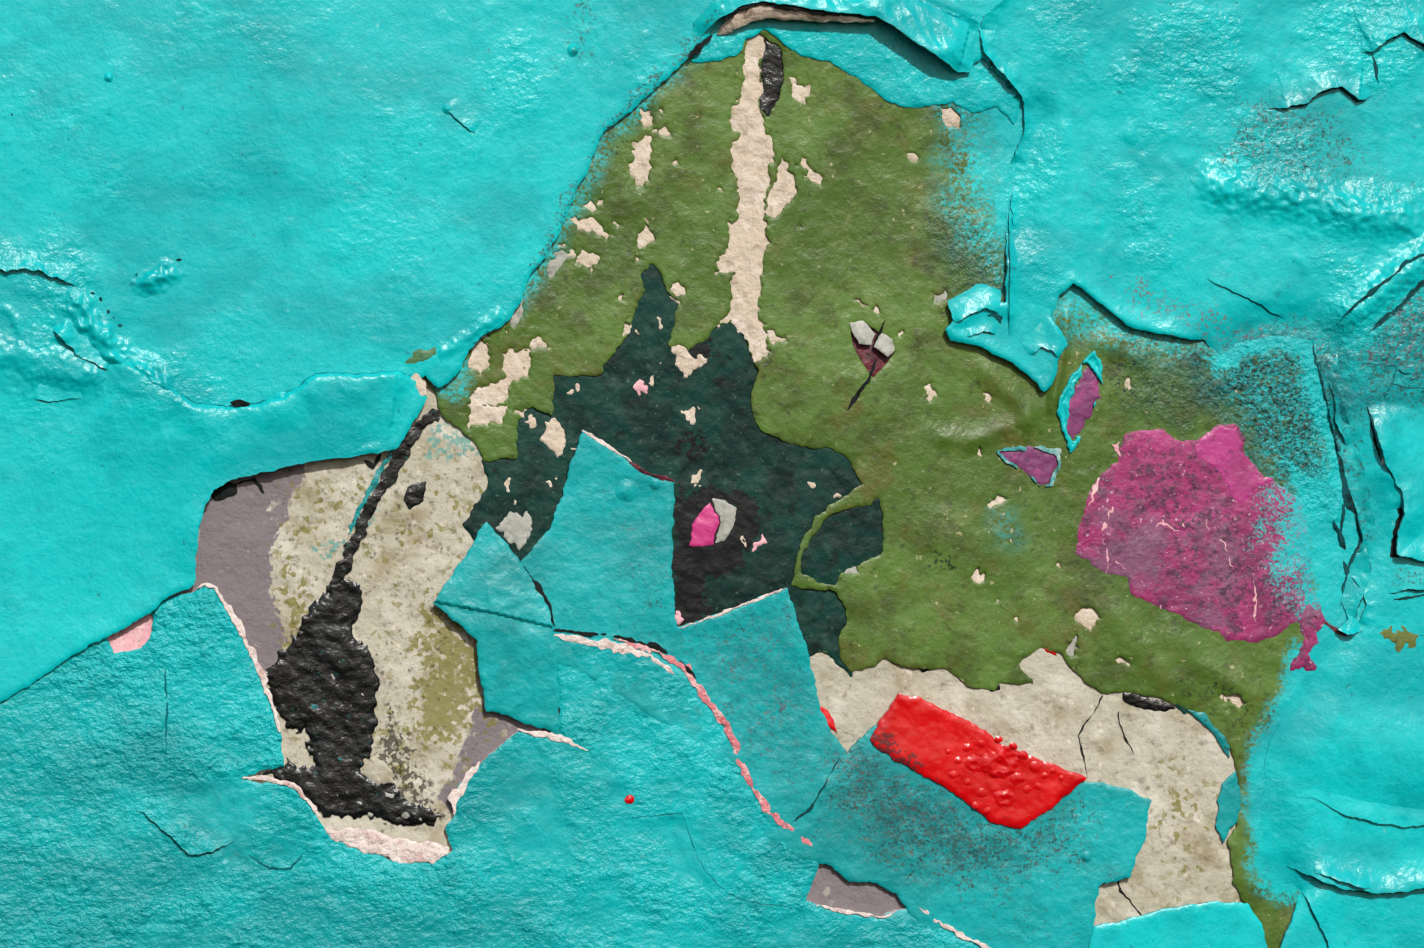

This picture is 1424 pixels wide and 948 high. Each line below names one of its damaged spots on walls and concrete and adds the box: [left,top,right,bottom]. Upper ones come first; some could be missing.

crack [1268,0,1424,110]
crack [1208,261,1289,318]
peeling [424,0,1361,948]
crack [1313,344,1424,618]
peeling [61,362,441,826]
crack [1416,635,1424,670]
flaking render [324,827,449,864]
peeling [1303,884,1377,948]